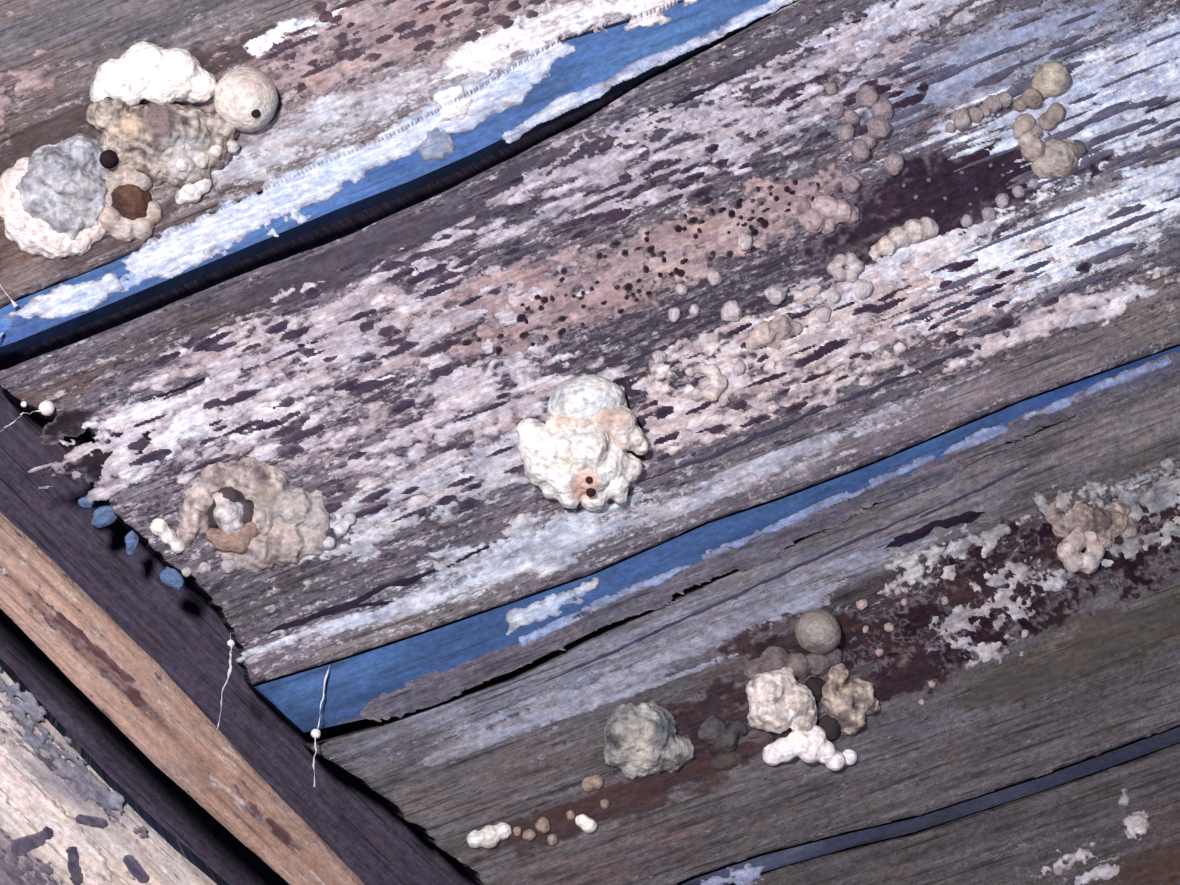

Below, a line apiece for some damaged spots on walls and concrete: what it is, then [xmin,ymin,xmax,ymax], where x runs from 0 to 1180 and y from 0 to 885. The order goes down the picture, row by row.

peeling [0,0,1180,663]
spalling [50,605,159,719]
peeling [360,352,1180,722]
peeling [417,511,1180,767]